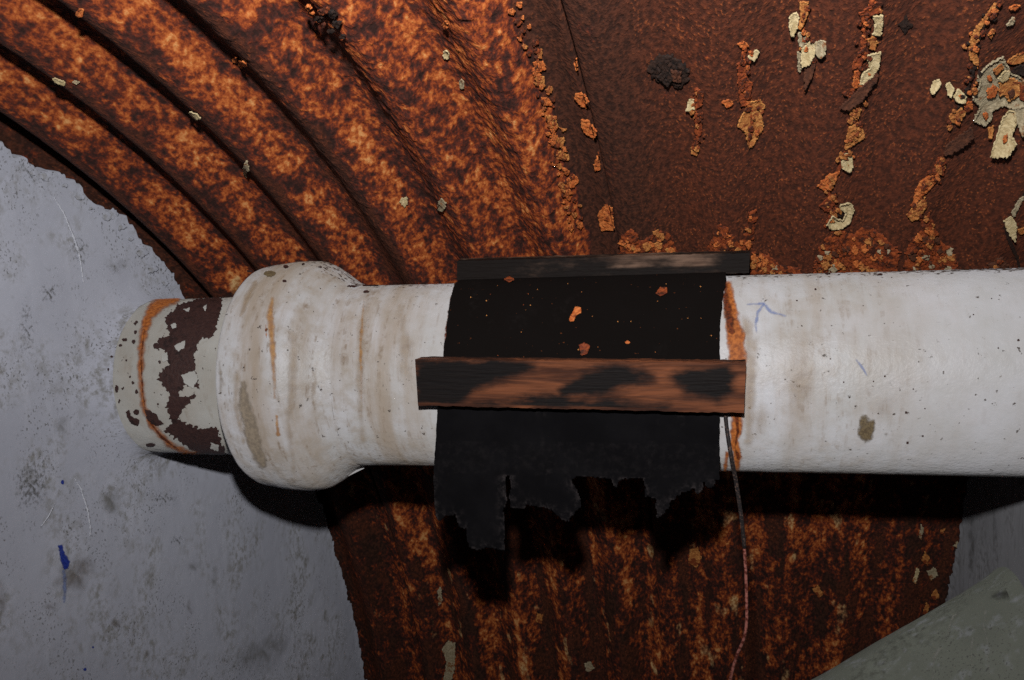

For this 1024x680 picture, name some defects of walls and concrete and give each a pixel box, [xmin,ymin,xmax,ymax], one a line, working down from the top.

peeling [788,1,826,90]
rust [507,2,583,232]
rust [574,92,597,140]
peeling [817,0,884,230]
peeling [906,0,1024,243]
rust [597,204,678,254]
rust [706,209,958,275]
rust [723,282,746,360]
peeling [115,297,225,455]
rust [138,298,202,455]
peeling [239,382,266,467]
rust [724,412,743,471]